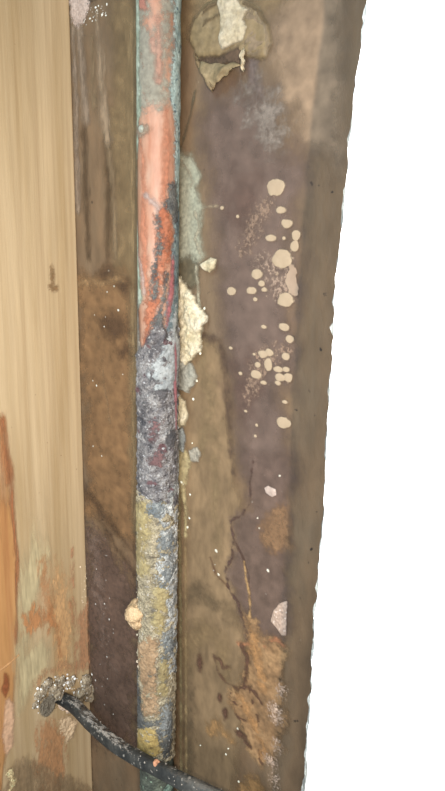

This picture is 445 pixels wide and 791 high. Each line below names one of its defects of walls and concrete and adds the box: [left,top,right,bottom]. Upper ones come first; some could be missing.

peeling [187,0,346,166]
peeling [236,179,301,307]
peeling [239,323,294,412]
peeling [277,417,291,428]
crack [213,461,260,640]
rust [21,566,90,688]
rust [213,616,290,769]